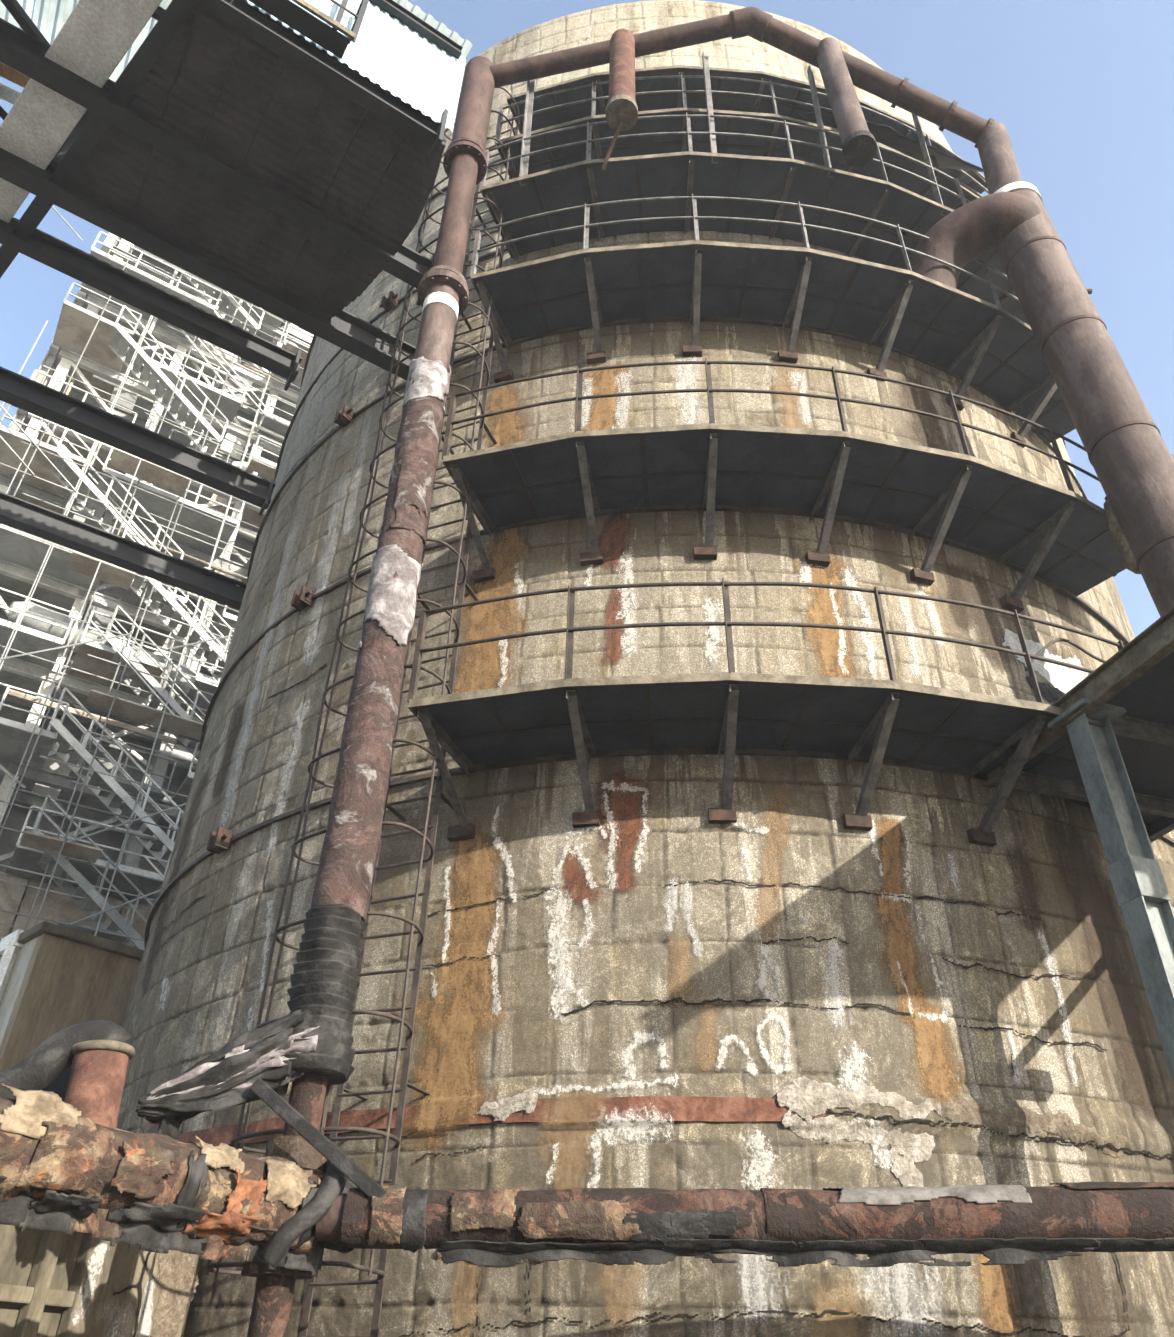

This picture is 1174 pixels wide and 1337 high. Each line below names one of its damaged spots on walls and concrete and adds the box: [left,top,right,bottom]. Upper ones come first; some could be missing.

corrosion [454,527,530,693]
spalling [1002,629,1088,701]
corrosion [597,773,647,893]
water stain [545,780,650,1022]
corrosion [402,832,507,1151]
peeling [476,1089,538,1121]
water stain [534,1032,679,1095]
crack [559,997,911,1016]
water stain [717,943,793,1076]
peeling [777,1077,1128,1187]
crack [825,1111,1174,1159]
crack [399,1252,1130,1337]